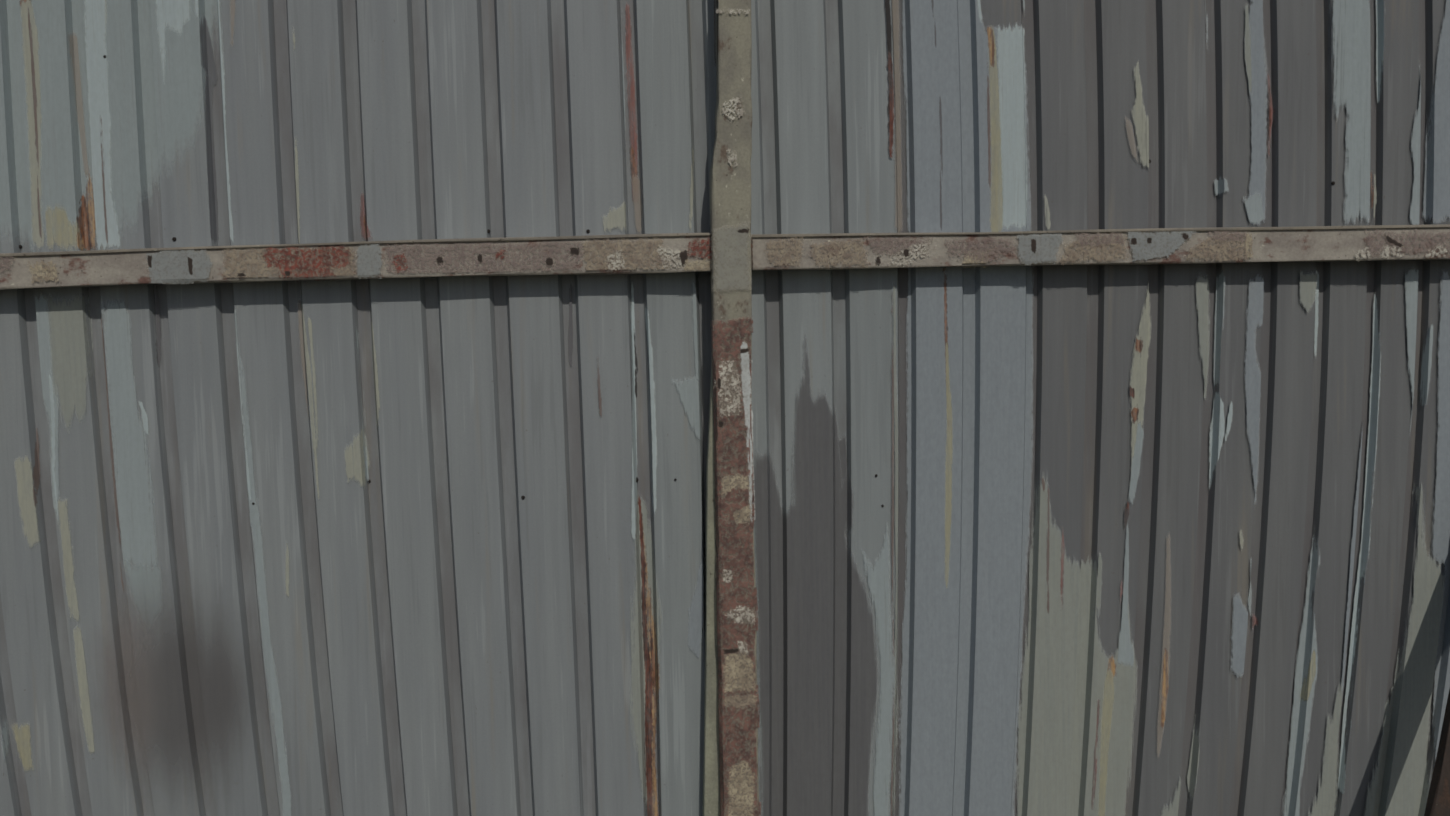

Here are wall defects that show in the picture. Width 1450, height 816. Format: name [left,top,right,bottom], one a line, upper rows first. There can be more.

corrosion [19,0,44,248]
corrosion [222,193,370,282]
peeling [1196,272,1264,503]
peeling [1214,0,1267,224]
peeling [1300,271,1319,355]
peeling [1331,0,1450,816]
corrosion [630,283,662,816]
peeling [1231,531,1258,676]
peeling [1284,296,1381,816]
peeling [1162,726,1200,816]